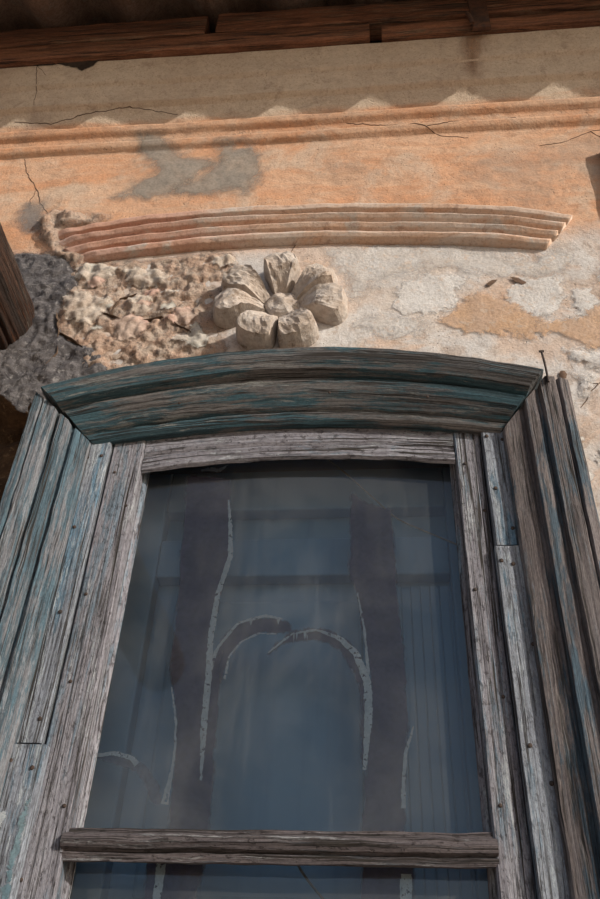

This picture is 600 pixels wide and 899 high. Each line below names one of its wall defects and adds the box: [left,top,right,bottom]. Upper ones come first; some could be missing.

crack [18,106,178,125]
crack [411,121,468,138]
crack [540,130,600,146]
spalling [38,209,237,370]
peeling [326,244,600,398]